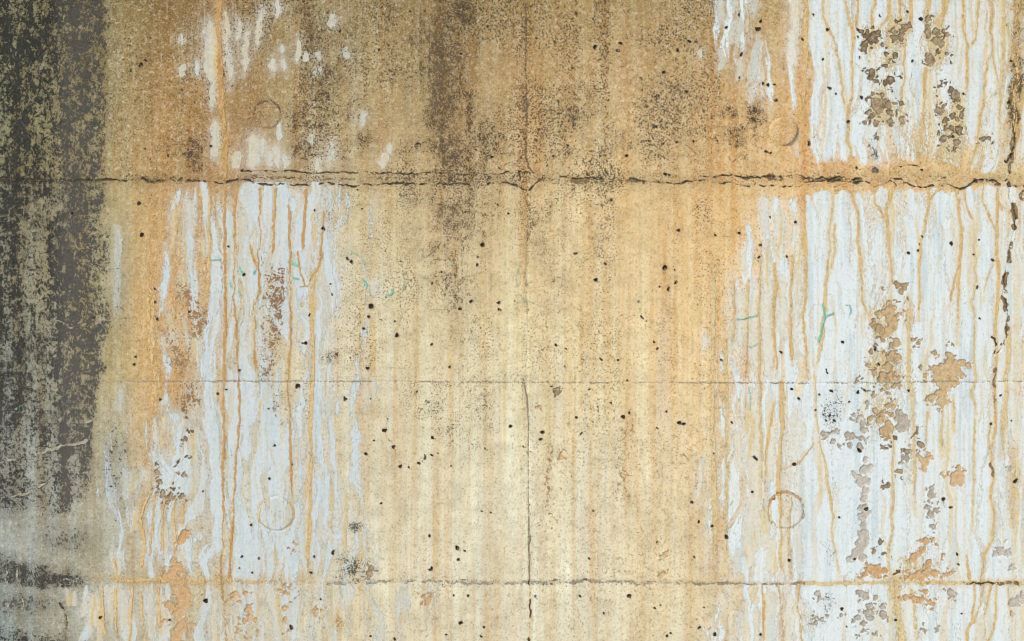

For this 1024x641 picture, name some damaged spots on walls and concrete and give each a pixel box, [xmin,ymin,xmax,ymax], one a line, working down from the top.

leakage [0,0,410,641]
rust [183,0,275,640]
rust [249,187,324,565]
crack [0,61,1024,424]
rust [709,0,1024,641]
peeling [858,19,912,141]
peeling [809,280,974,639]
peeling [922,10,954,67]
peeling [933,79,967,153]